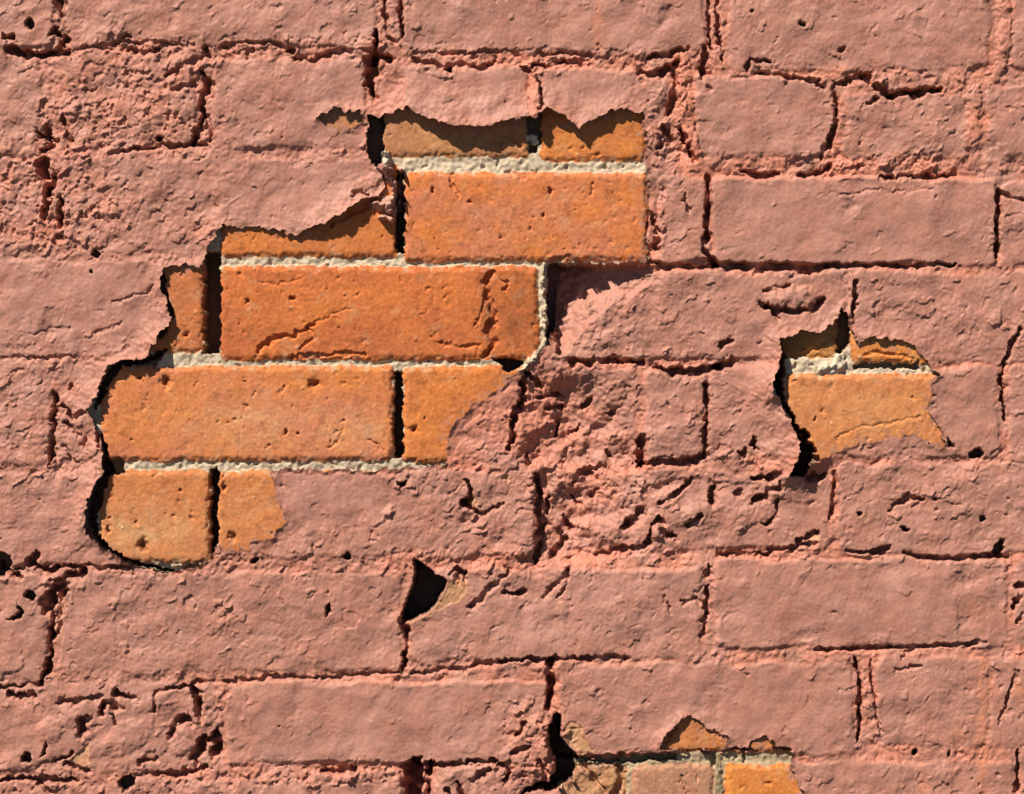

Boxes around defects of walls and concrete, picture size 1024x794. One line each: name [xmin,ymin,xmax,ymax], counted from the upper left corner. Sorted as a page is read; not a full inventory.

peeling [70,90,672,601]
peeling [753,298,945,495]
spalling [401,559,448,625]
spalling [466,570,528,610]
peeling [557,709,804,794]